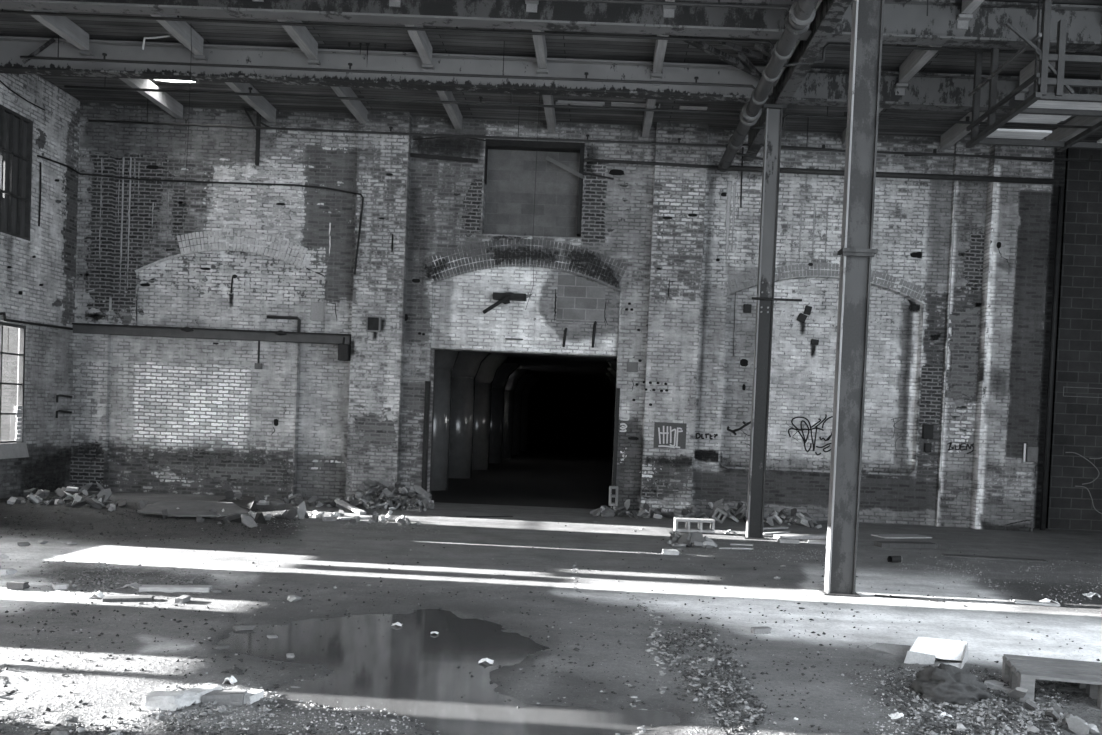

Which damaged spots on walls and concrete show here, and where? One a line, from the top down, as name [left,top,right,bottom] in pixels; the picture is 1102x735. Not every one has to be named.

peeling [52,140,340,325]
damp [943,181,956,412]